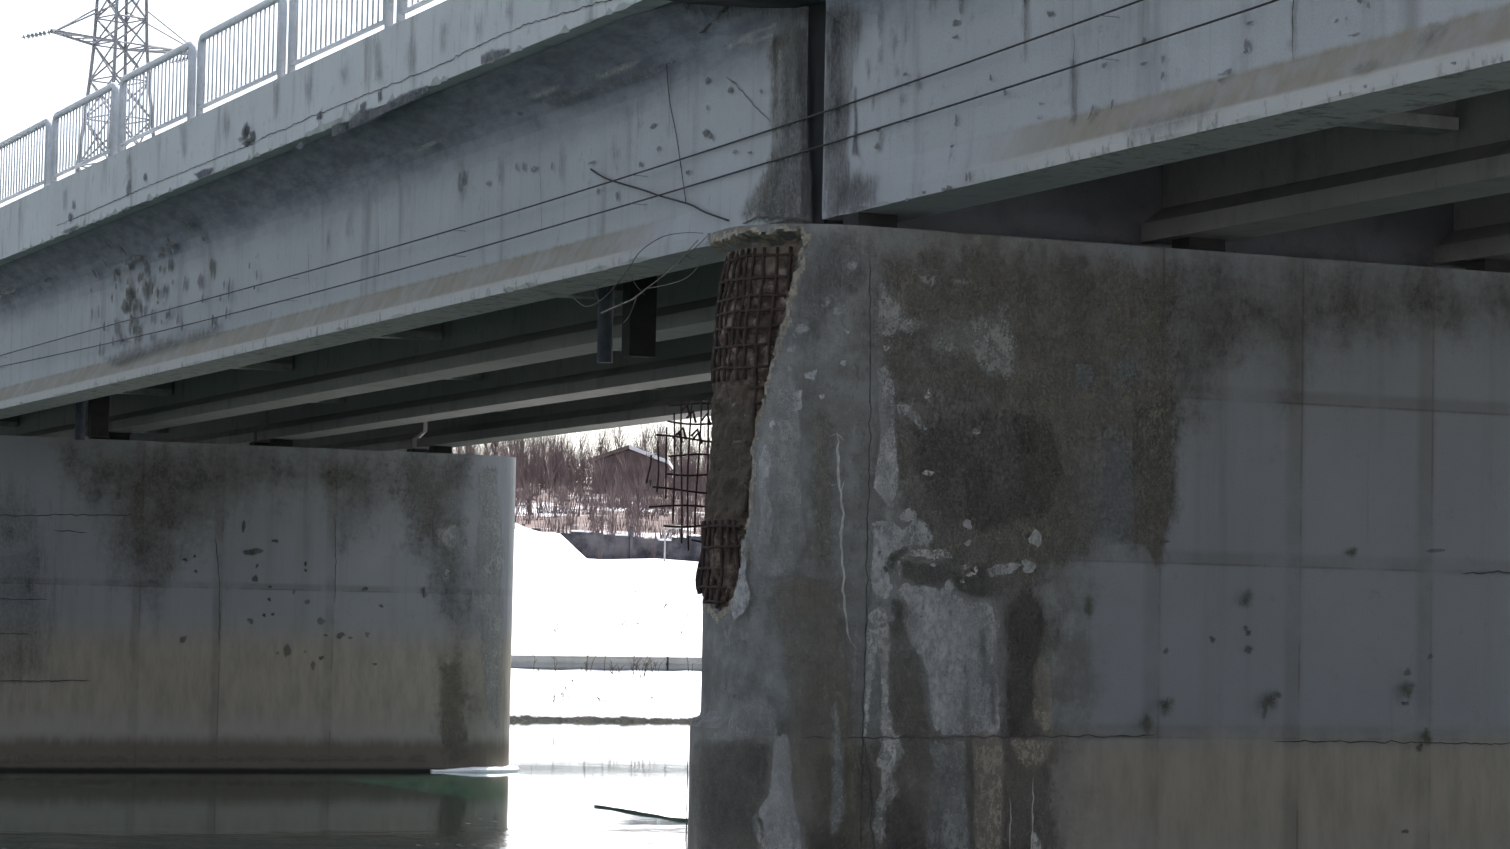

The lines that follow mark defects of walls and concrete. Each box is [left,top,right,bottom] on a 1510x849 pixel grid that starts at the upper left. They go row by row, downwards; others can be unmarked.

damp [729,10,811,221]
damp [825,7,871,213]
damp [92,451,295,582]
damp [403,458,503,723]
damp [442,663,467,744]
spalling [646,224,825,623]
peeling [870,508,1042,849]
crack [801,258,1157,849]
damp [693,242,1462,849]
crack [1274,738,1510,746]